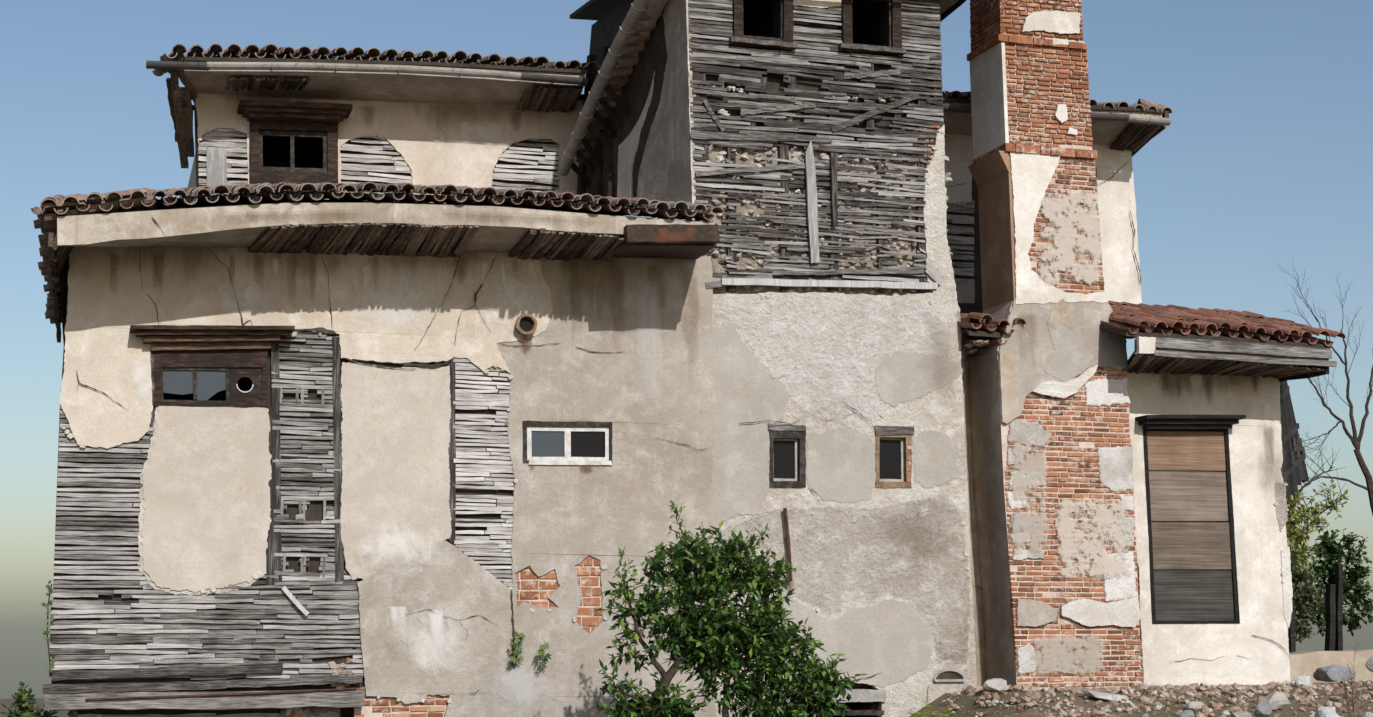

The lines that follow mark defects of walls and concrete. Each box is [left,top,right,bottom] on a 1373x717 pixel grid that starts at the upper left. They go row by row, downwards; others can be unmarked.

flaking render [198,127,249,196]
flaking render [340,134,412,202]
flaking render [688,0,975,429]
crack [211,251,252,326]
leakage [362,266,420,323]
crack [294,254,620,369]
crack [77,374,126,409]
flaking render [453,358,560,613]
flaking render [49,331,452,717]